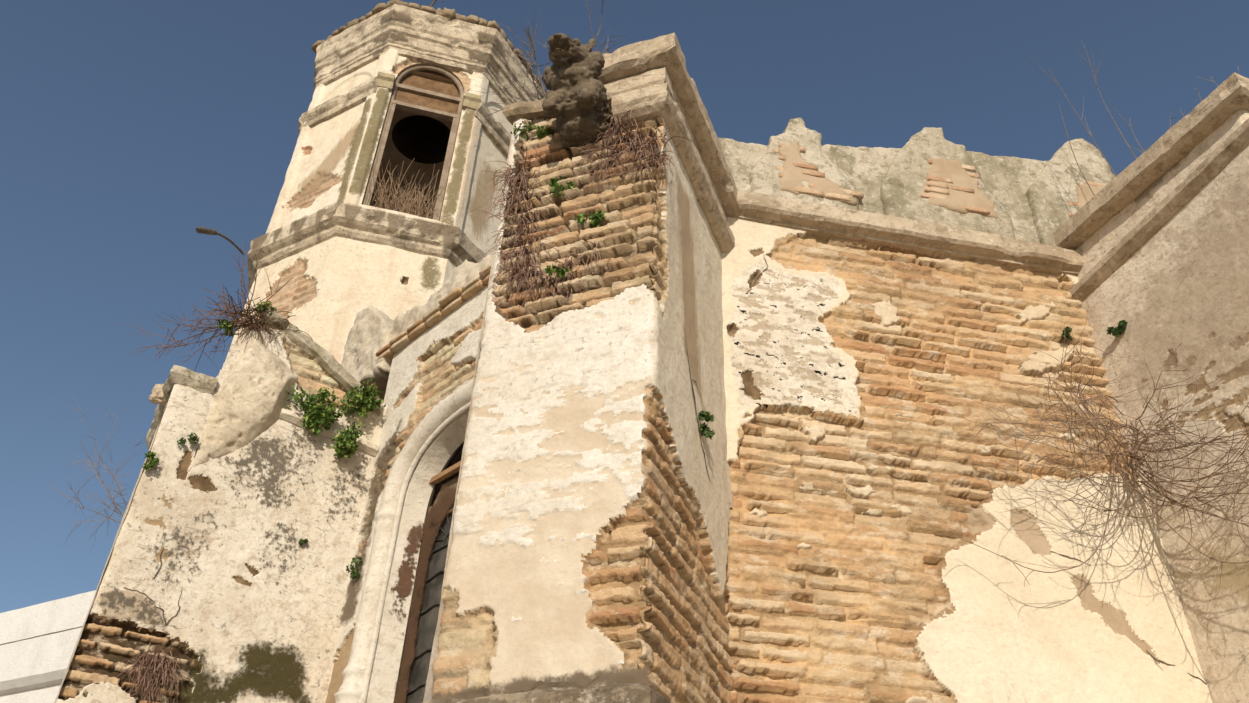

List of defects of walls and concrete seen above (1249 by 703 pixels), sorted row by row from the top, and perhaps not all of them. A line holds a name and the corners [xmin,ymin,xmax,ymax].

spalling [286,172,343,212]
spalling [265,256,320,319]
spalling [357,108,1139,703]
flaking render [1159,332,1249,444]
spalling [176,450,218,493]
spalling [58,590,202,703]